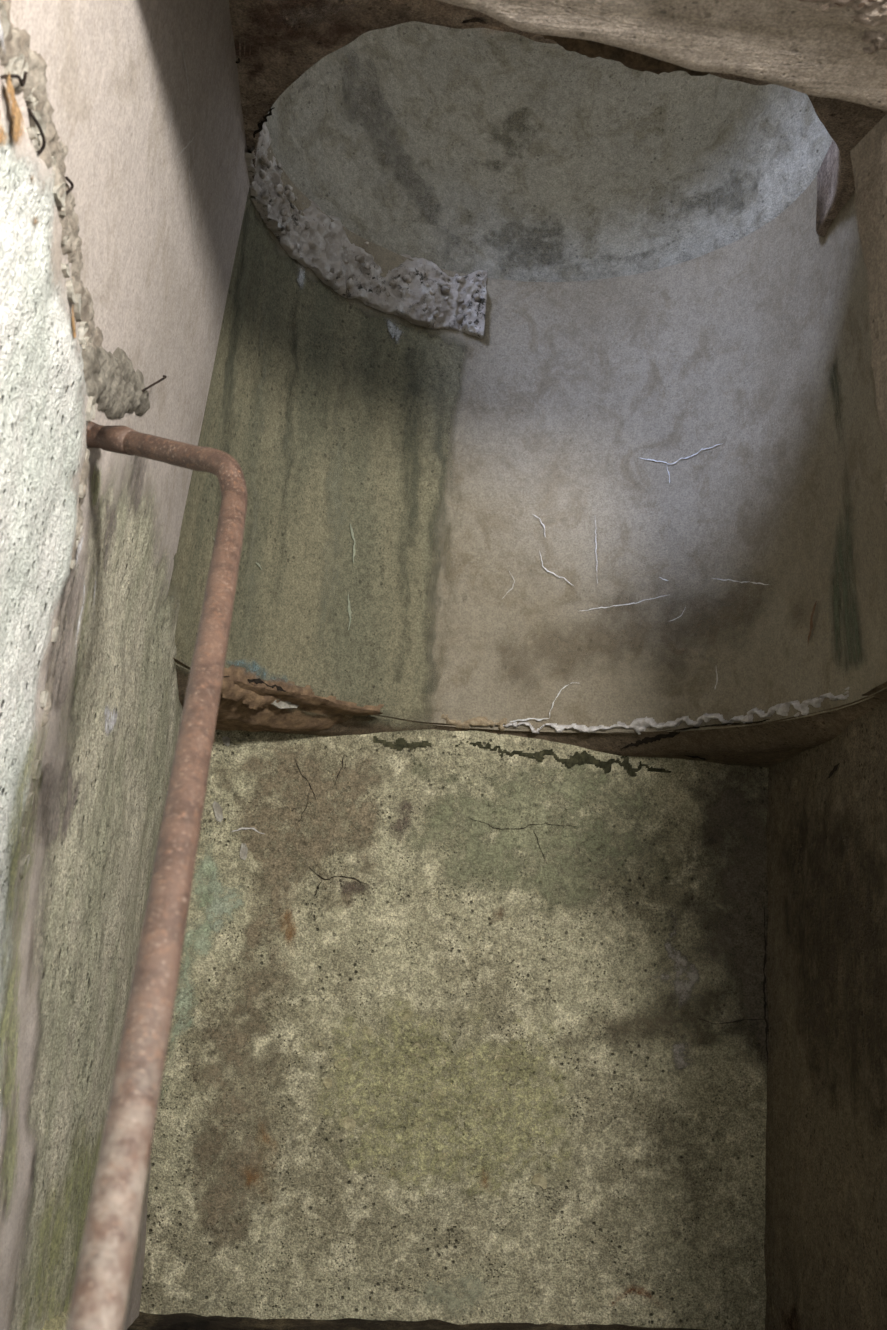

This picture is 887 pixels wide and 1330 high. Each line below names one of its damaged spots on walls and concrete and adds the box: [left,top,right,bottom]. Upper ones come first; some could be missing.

spalling [244,122,488,339]
damp [387,321,402,340]
peeling [0,0,150,1086]
spalling [215,664,384,746]
damp [373,736,432,751]
damp [193,747,412,1241]